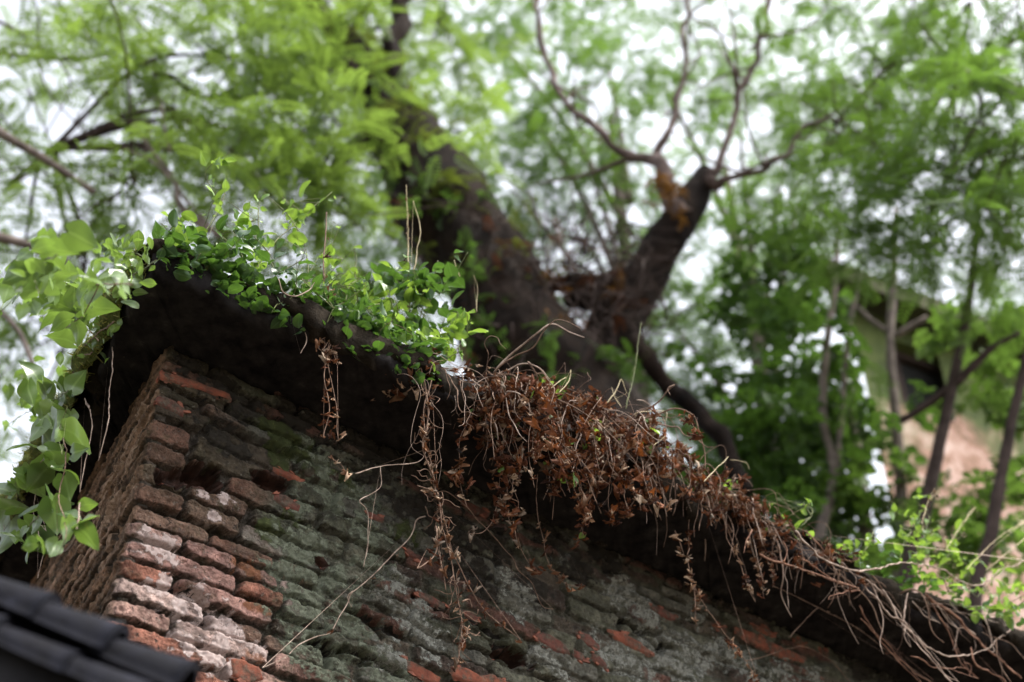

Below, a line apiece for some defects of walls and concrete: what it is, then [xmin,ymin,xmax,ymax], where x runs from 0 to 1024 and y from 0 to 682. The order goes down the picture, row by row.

spalling [153,461,223,494]
water stain [172,353,683,611]